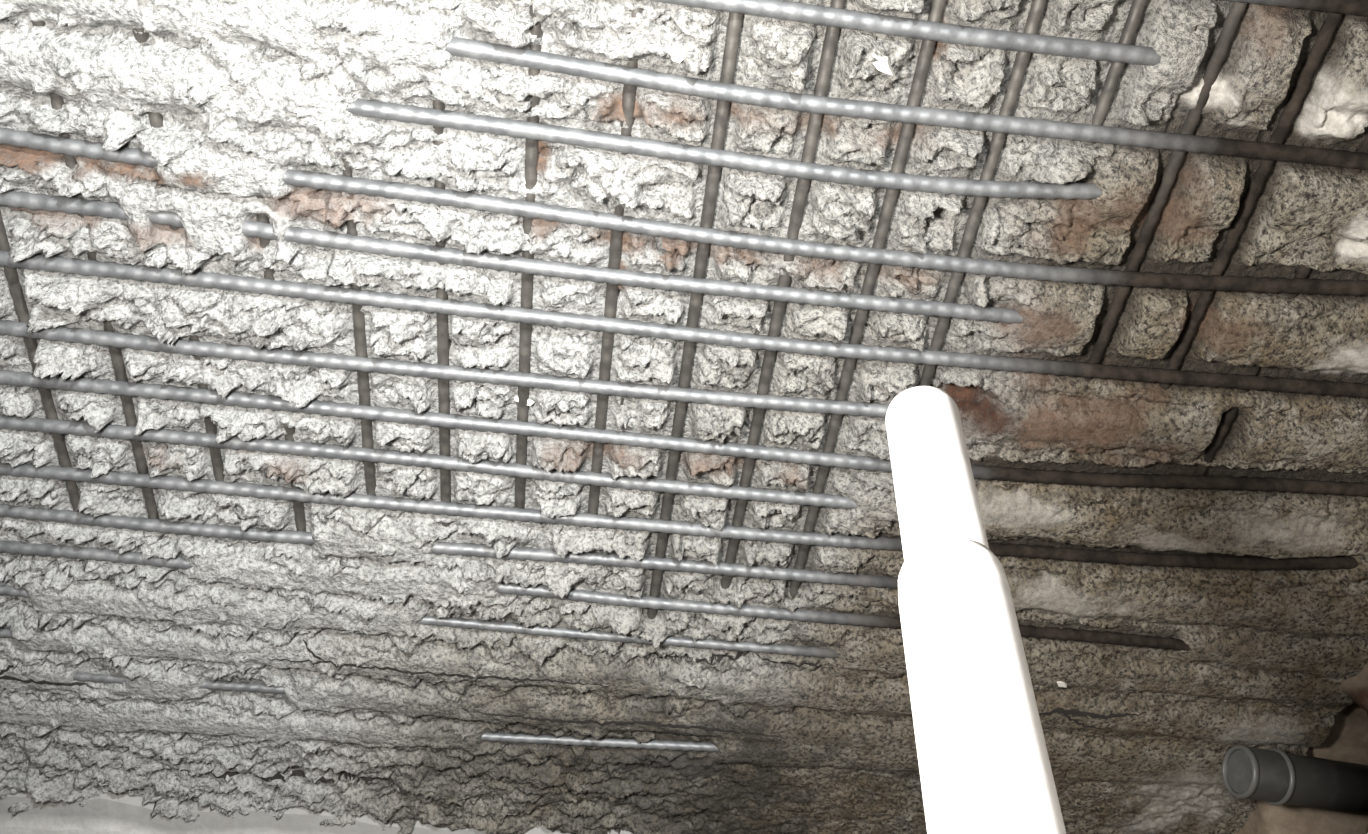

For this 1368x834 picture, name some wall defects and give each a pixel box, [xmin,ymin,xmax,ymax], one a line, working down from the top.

spalling [0,0,1368,484]
spalling [0,320,927,834]
damp [572,727,782,832]
spalling [971,465,1368,834]